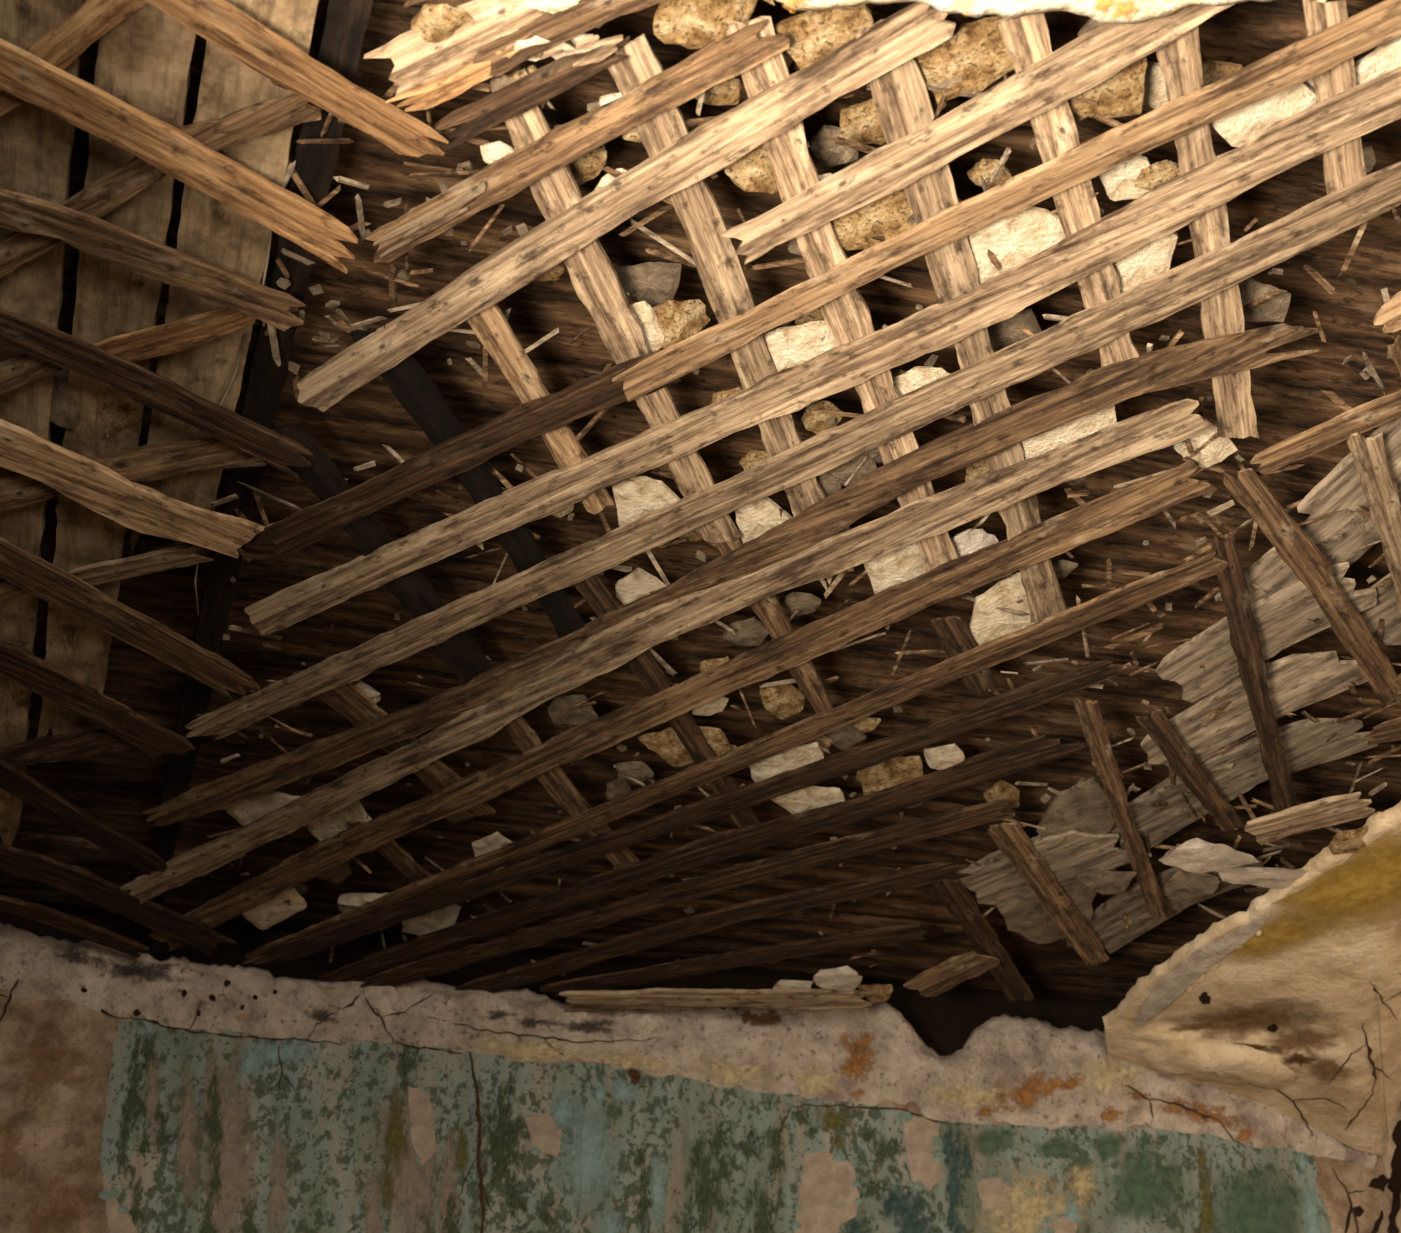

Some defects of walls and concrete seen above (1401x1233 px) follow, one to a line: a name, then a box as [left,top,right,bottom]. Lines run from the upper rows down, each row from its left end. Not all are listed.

leakage [1232,835,1401,959]
leakage [1172,1000,1346,1080]
crack [101,995,662,1233]
peeling [406,1086,437,1168]
peeling [525,1113,564,1156]
peeling [899,1111,946,1191]
crack [1275,985,1401,1233]
peeling [99,1172,138,1233]
peeling [791,1152,863,1233]
peeling [974,1174,1011,1210]